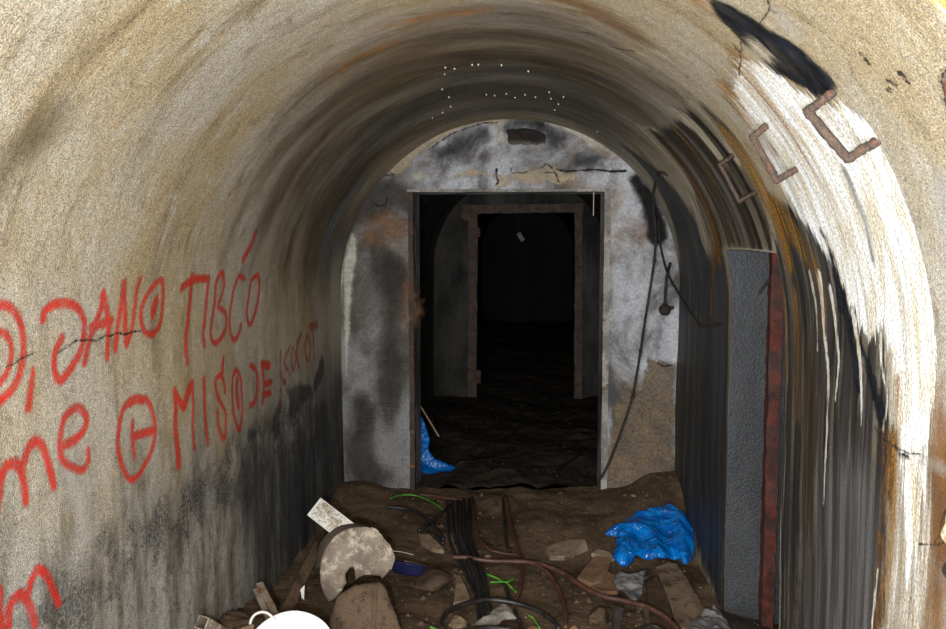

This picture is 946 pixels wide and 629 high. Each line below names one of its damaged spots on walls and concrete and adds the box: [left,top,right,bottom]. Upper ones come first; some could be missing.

crack [495,164,627,185]
crack [58,330,140,353]
damp [638,50,946,629]
damp [99,377,344,574]
damp [39,575,110,629]